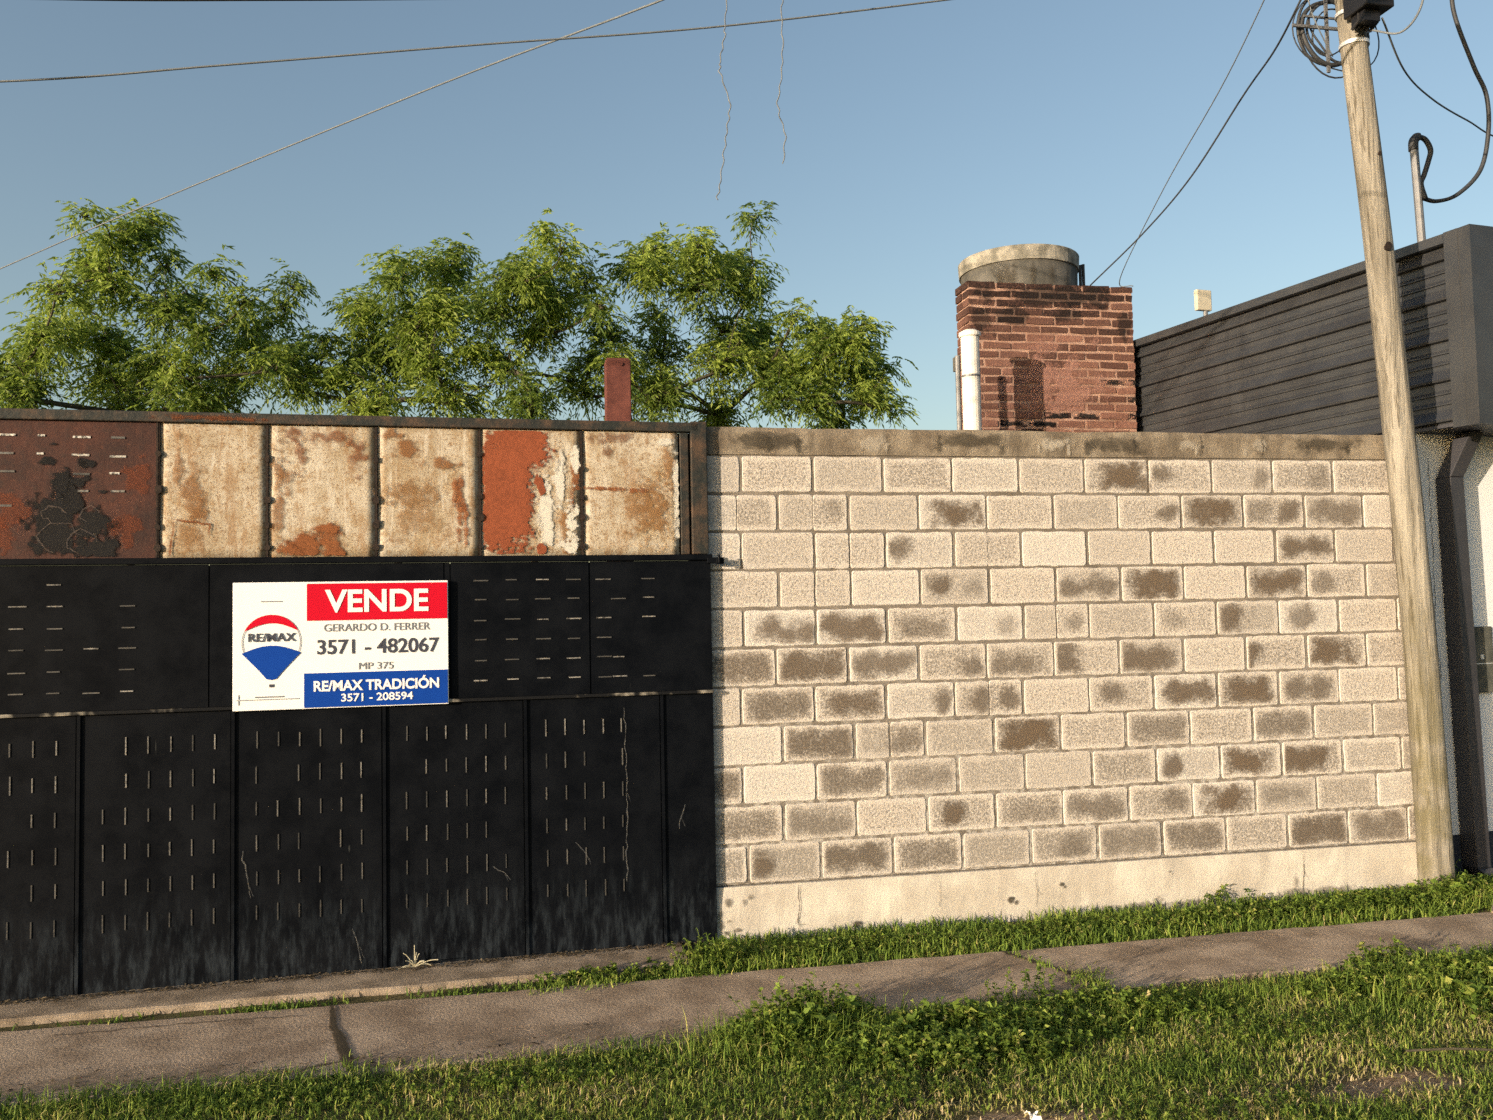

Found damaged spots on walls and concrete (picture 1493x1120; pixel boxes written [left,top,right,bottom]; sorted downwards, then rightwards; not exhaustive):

rust [169,457,211,556]
rust [271,428,368,556]
rust [383,428,673,555]
peeling [536,445,581,554]
damp [1038,438,1169,491]
damp [1158,497,1234,526]
damp [1061,569,1179,599]
damp [1250,536,1333,596]
damp [759,613,915,714]
damp [1123,637,1358,705]
damp [970,689,1058,751]
damp [1202,747,1327,814]